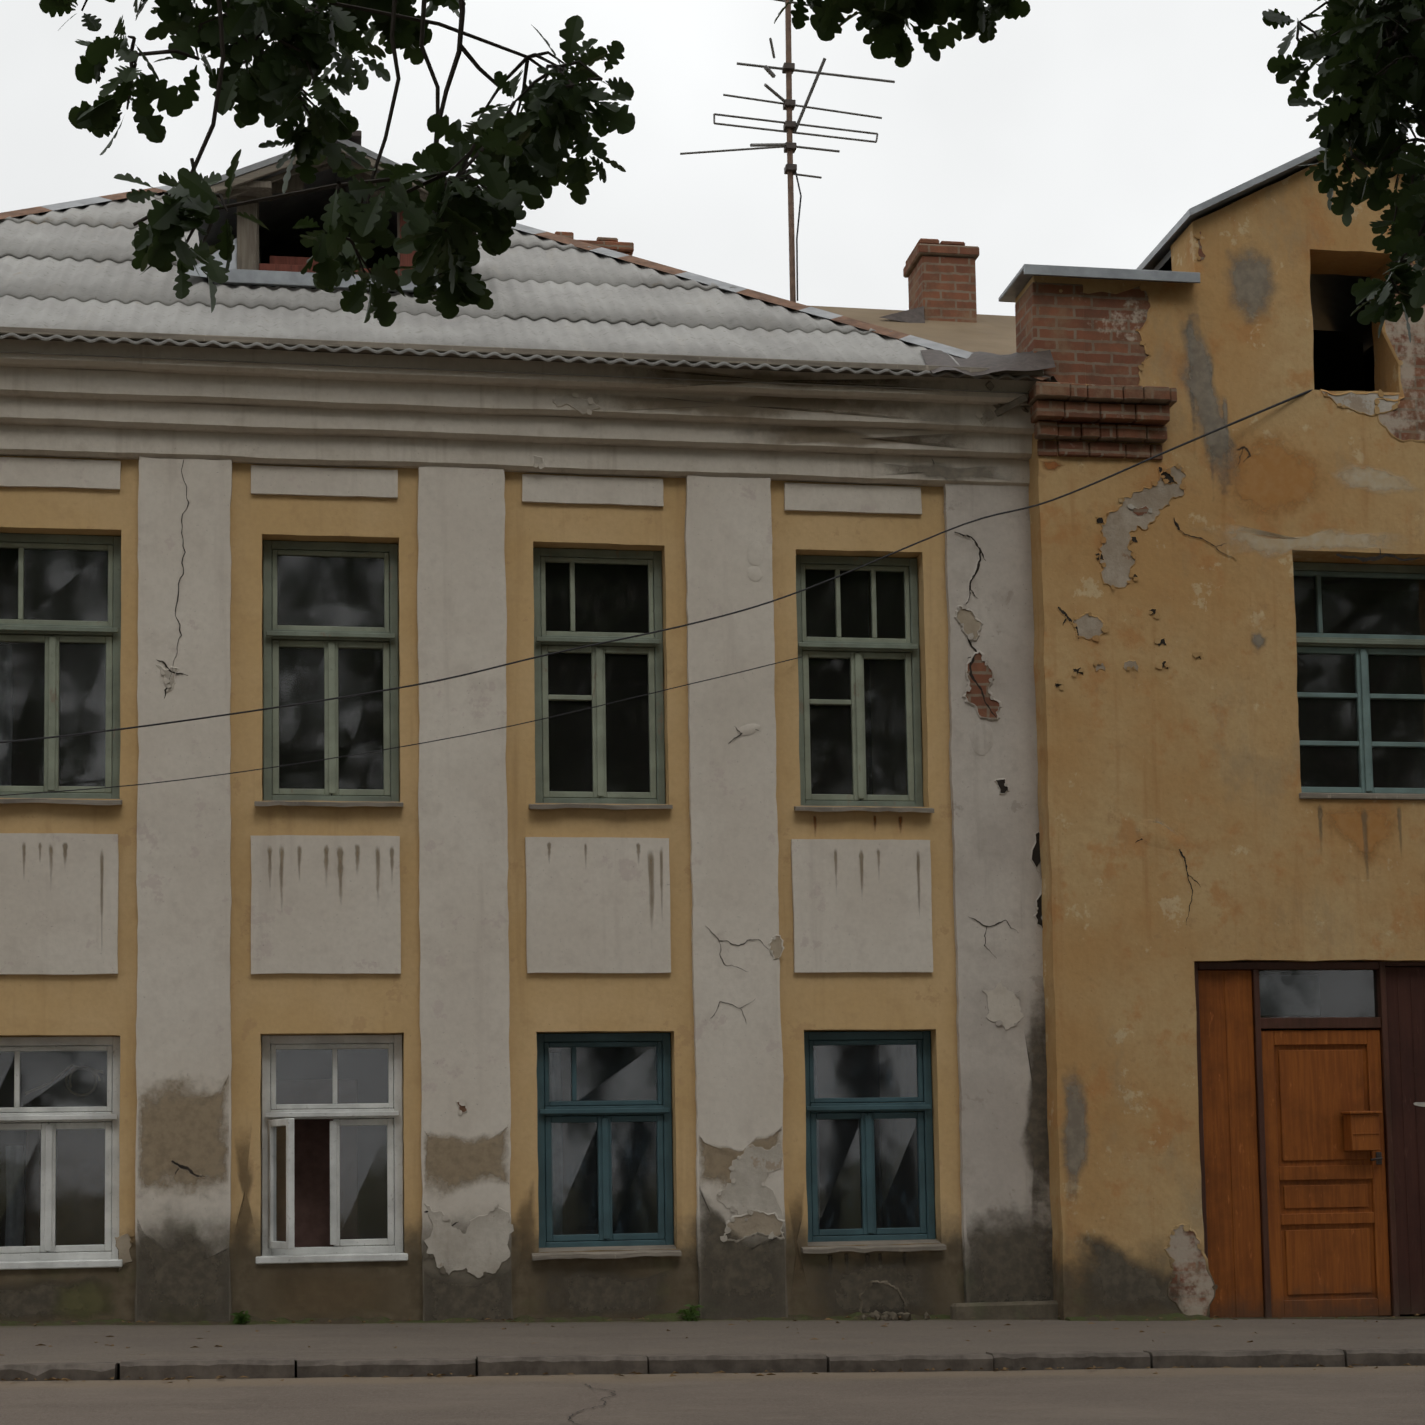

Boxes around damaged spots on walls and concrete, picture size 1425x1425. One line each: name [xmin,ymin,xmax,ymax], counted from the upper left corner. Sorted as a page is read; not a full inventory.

water stain [1185,321,1316,512]
flaking render [1320,284,1425,443]
crack [157,460,189,698]
crack [954,532,1000,719]
flaking render [954,605,1002,722]
crack [1174,518,1237,562]
water stain [1238,529,1383,553]
water stain [324,846,359,887]
crack [707,927,768,1020]
water stain [137,1079,251,1320]
peeling [422,1200,514,1278]
flaking render [1164,1224,1218,1317]